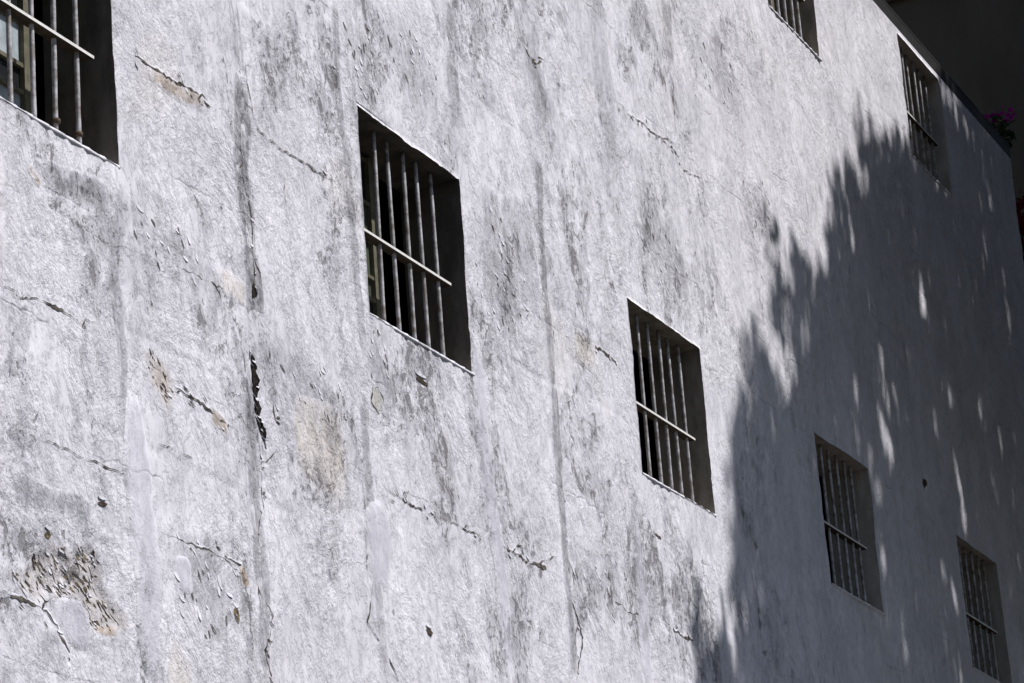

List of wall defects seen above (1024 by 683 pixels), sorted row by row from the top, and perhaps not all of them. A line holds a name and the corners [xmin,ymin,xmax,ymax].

crack [135,48,211,107]
flaking render [93,147,428,511]
spalling [0,525,136,649]
crack [386,488,584,674]